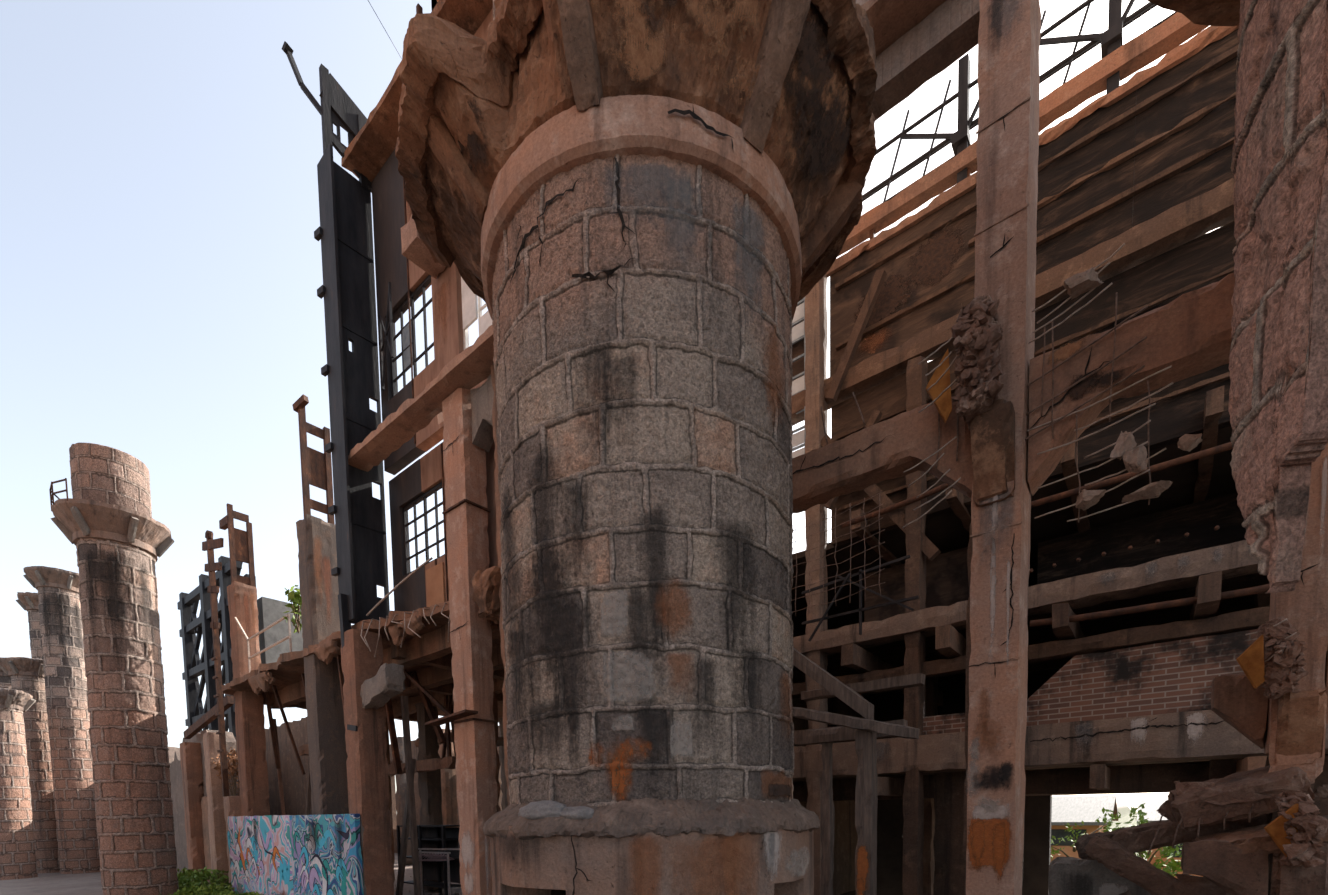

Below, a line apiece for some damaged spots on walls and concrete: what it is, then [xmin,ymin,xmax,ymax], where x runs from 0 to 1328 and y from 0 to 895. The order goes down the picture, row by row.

crack [668,108,733,149]
damp [502,452,587,752]
damp [627,509,665,694]
damp [721,528,752,646]
crack [571,835,591,895]
rust [967,817,1012,880]